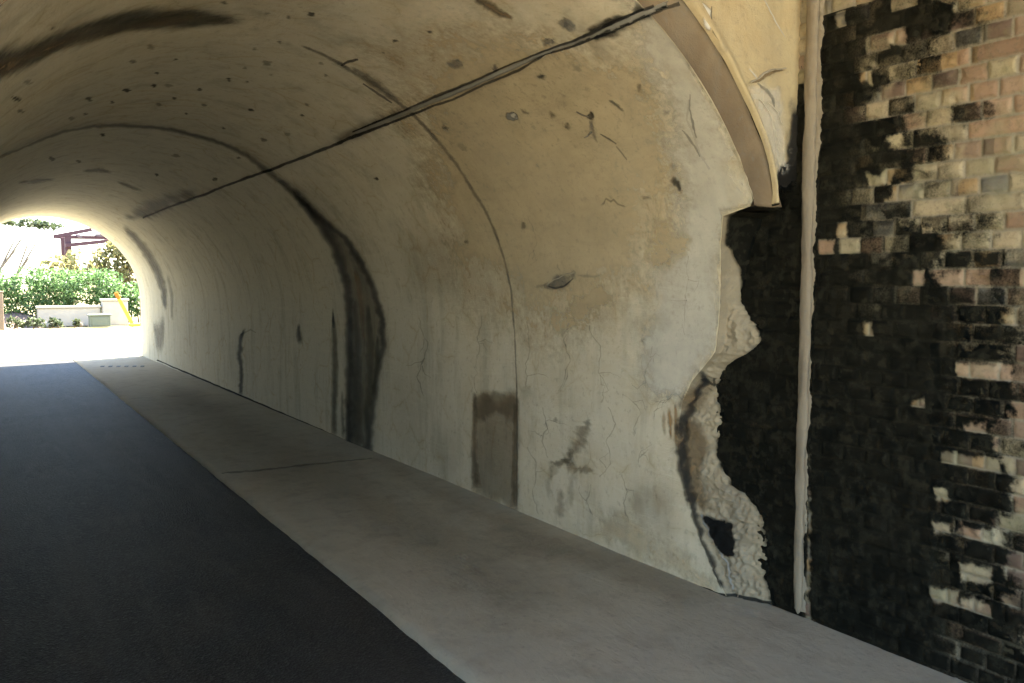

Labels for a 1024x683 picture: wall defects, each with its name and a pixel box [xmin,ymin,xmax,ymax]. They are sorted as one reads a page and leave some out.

damp [0,10,230,77]
crack [0,1,680,446]
crack [513,382,521,476]
peeling [398,16,771,604]
crack [675,373,723,587]
damp [716,0,1024,683]